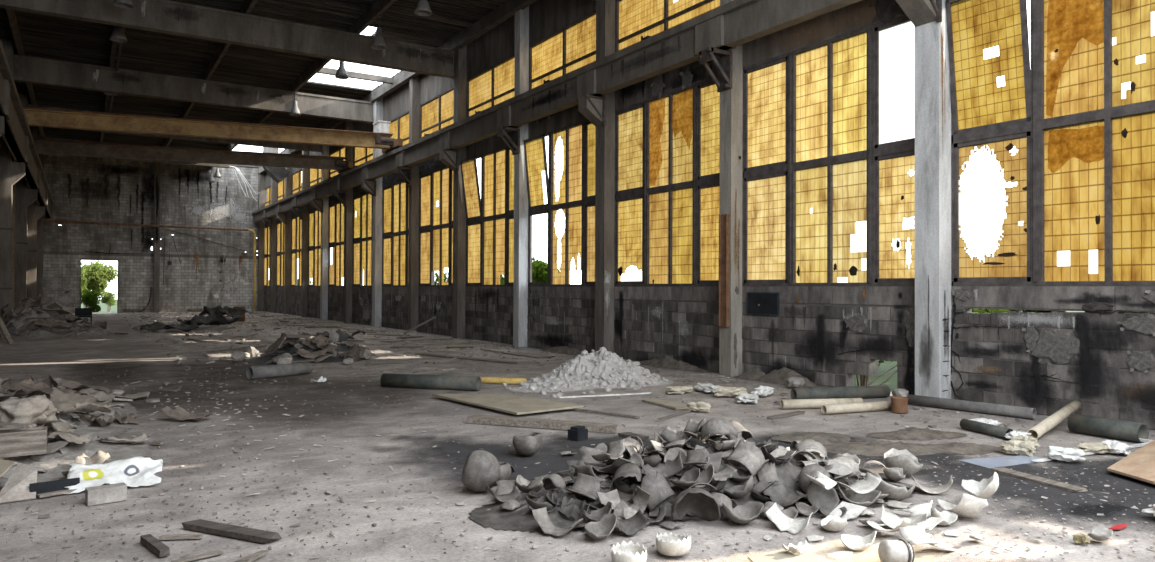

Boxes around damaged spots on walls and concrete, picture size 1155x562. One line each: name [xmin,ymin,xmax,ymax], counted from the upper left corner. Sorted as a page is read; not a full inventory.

leakage [68,174,158,246]
leakage [179,169,245,220]
leakage [1008,314,1091,389]